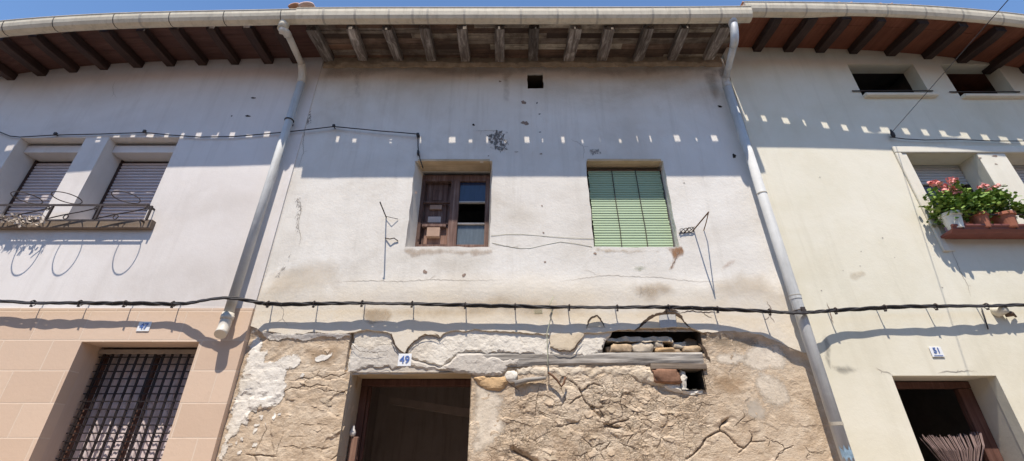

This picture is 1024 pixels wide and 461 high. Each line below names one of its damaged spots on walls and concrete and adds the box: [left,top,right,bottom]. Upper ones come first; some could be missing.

spalling [215,314,840,461]
crack [510,379,819,460]